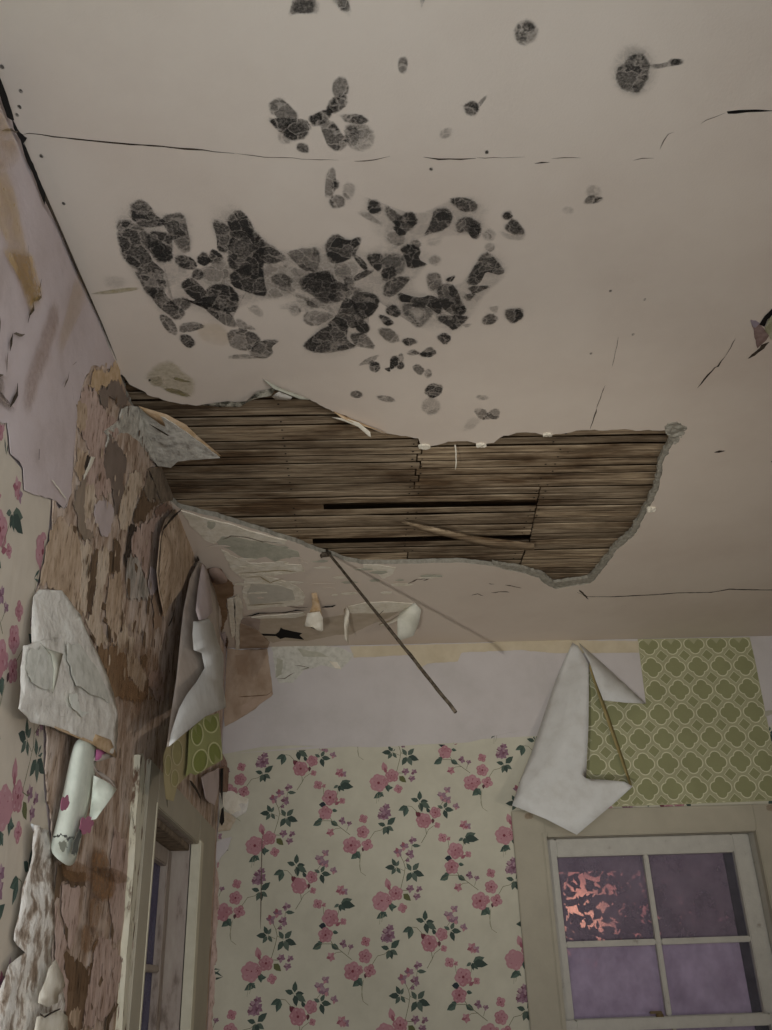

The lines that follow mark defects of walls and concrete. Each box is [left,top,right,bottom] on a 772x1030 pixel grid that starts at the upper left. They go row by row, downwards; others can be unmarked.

crack [0,245,42,407]
peeling [0,106,122,508]
crack [2,128,329,160]
leakage [112,198,504,398]
leakage [270,78,370,152]
crack [425,156,576,164]
leakage [483,308,523,324]
leakage [503,212,524,234]
crack [702,109,772,123]
peeling [181,510,568,753]
peeling [0,825,85,1030]
peeling [78,754,145,1030]